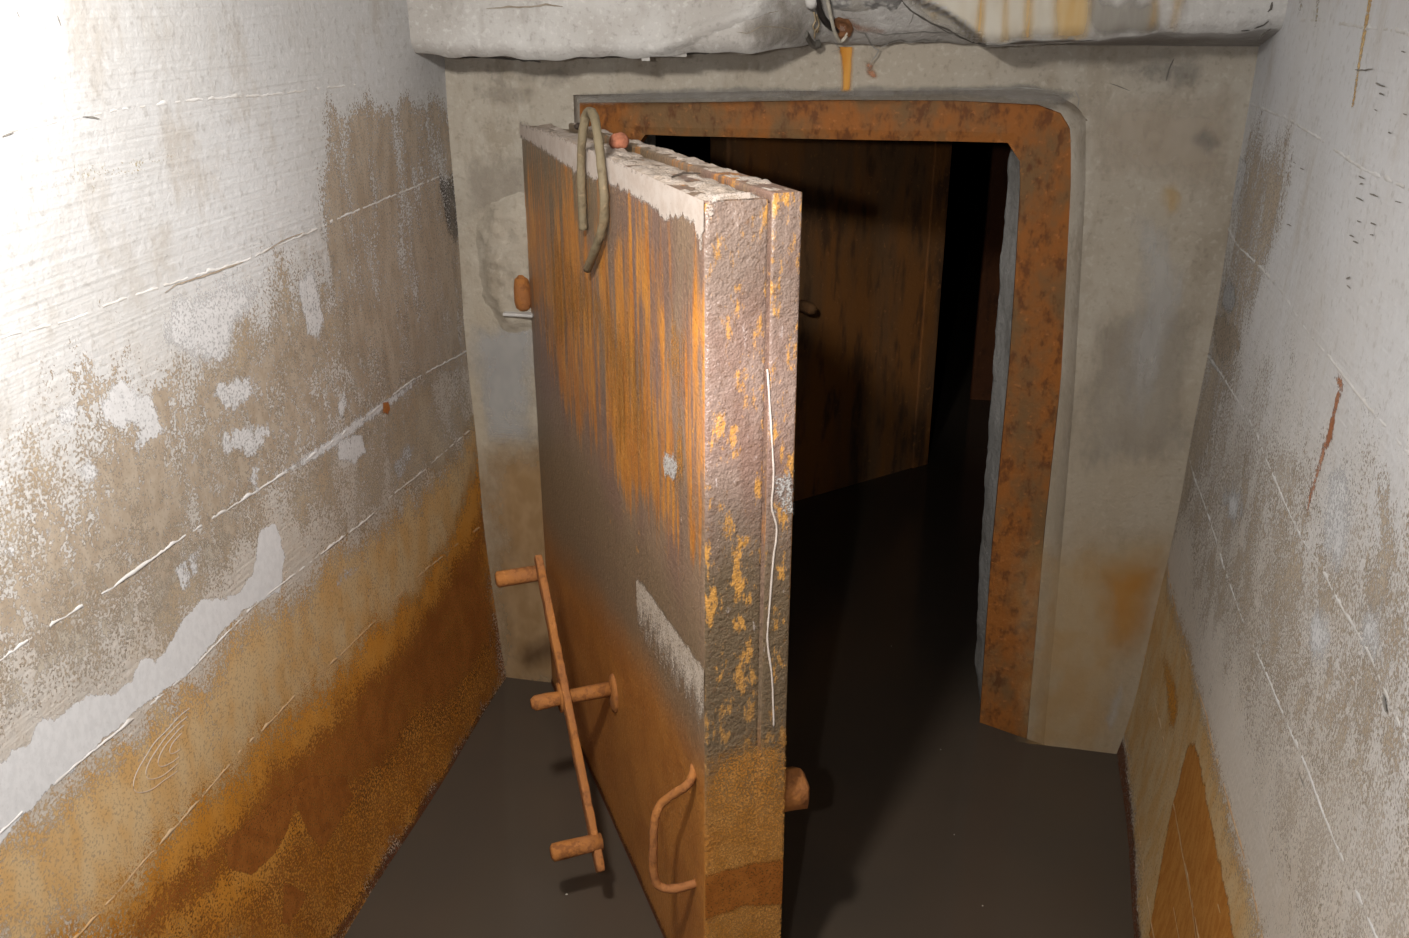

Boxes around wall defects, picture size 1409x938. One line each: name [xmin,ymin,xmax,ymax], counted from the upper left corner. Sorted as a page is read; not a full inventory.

crack [462,56,540,64]
crack [486,2,563,10]
crack [576,53,622,61]
rust [839,47,876,90]
spalling [830,0,902,13]
rust [1352,0,1372,107]
rust [667,304,685,487]
rust [1307,376,1344,510]
damp [0,89,552,938]
damp [1117,113,1409,938]